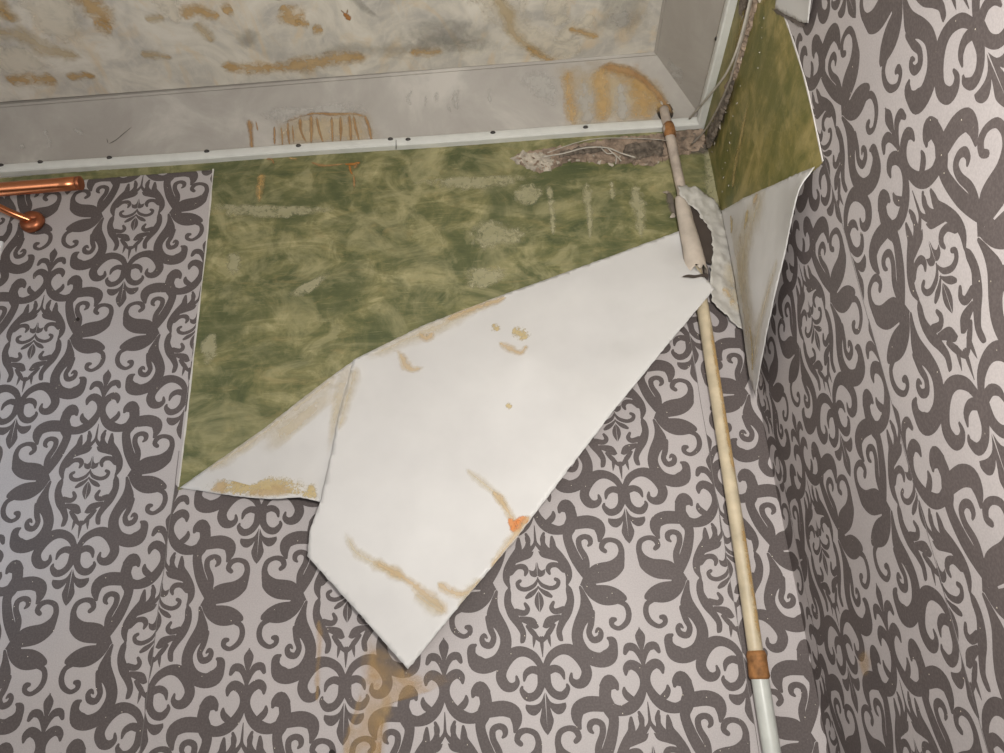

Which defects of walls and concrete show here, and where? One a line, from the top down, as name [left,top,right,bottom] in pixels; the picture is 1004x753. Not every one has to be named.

water stain [0,0,77,84]
water stain [146,0,233,41]
water stain [223,52,363,73]
water stain [280,5,323,33]
water stain [476,0,597,61]
water stain [525,64,671,121]
peeling [0,0,824,669]